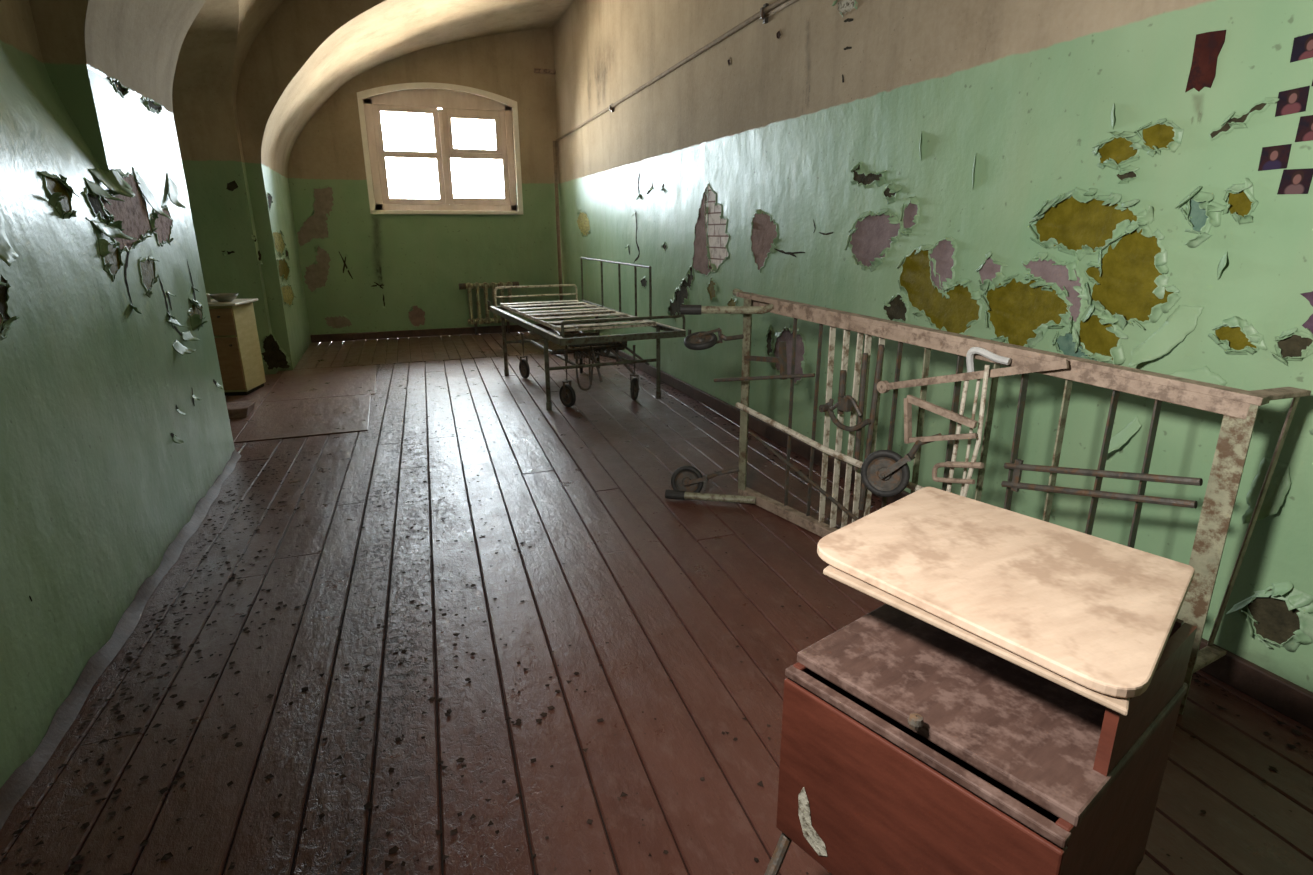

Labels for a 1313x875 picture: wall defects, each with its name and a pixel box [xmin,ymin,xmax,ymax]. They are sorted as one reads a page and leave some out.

peeling [1209,97,1279,141]
flaking render [0,207,20,341]
flaking render [38,167,186,298]
peeling [166,299,209,356]
flaking render [272,185,334,307]
flaking render [667,183,737,321]
flaking render [750,209,779,273]
peeling [844,104,1313,367]
peeling [1226,581,1313,652]